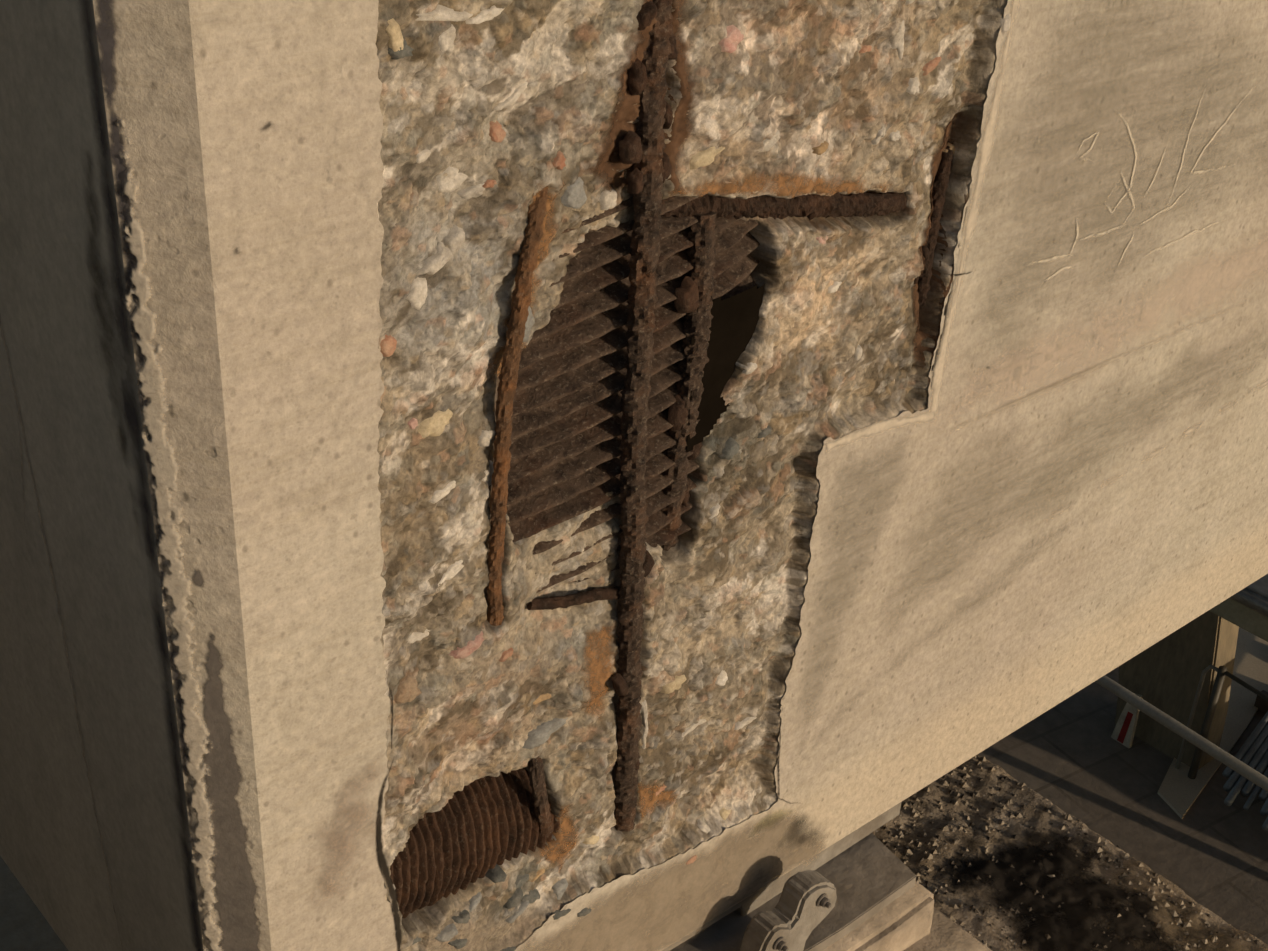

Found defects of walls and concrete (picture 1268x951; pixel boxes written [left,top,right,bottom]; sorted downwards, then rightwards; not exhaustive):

leakage [84,0,146,366]
corrosion [530,191,556,305]
corrosion [590,0,887,197]
corrosion [913,114,957,383]
spalling [375,0,1011,951]
leakage [119,382,201,951]
spalling [193,571,204,587]
corrosion [586,627,613,715]
corrosion [541,807,577,865]
corrosion [637,783,676,818]